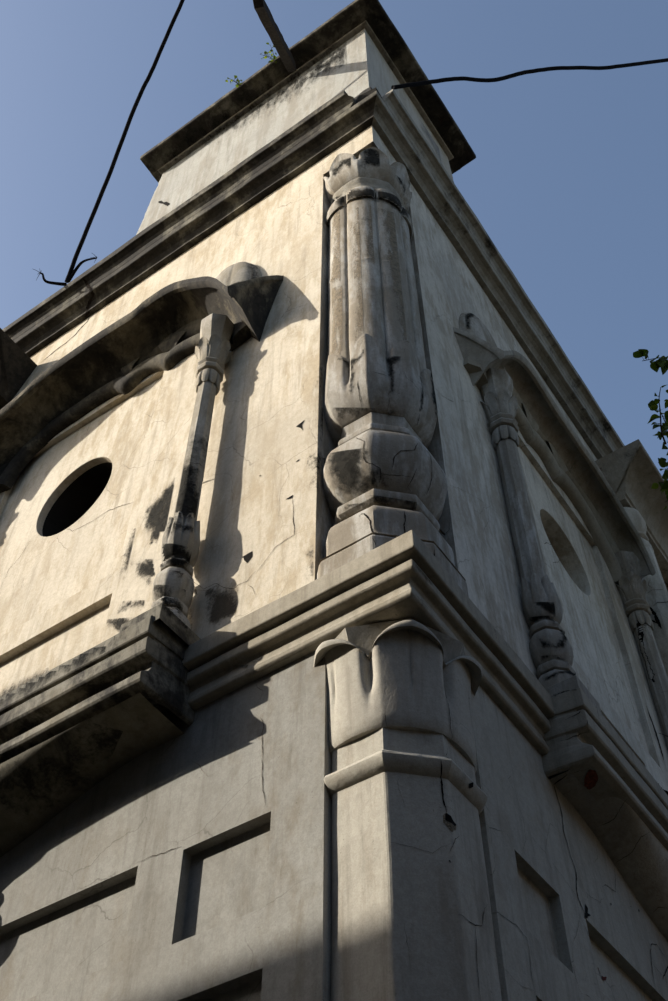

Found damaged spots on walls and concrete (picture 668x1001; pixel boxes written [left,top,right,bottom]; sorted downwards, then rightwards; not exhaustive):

damp [124,459,200,617]
crack [529,768,648,1000]